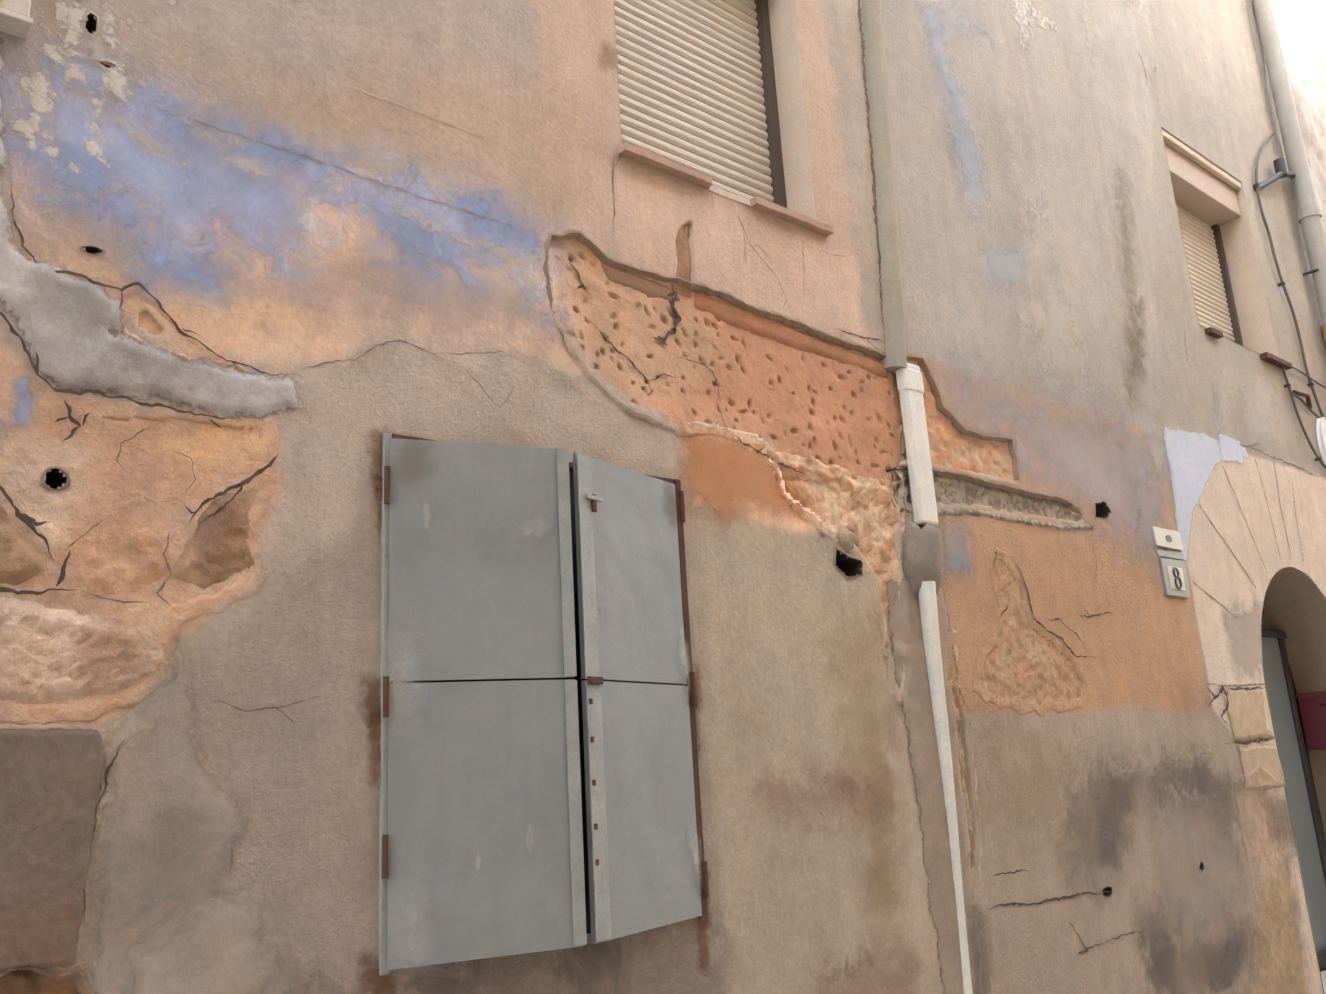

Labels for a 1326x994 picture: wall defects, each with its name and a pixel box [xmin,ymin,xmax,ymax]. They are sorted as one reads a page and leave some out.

flaking render [1008,0,1057,56]
spalling [0,0,914,514]
crack [129,99,809,476]
spalling [0,324,281,726]
hole [834,546,864,580]
spalling [907,355,1112,531]
spalling [949,546,1091,895]
crack [988,869,1148,954]
leakage [1154,784,1242,955]